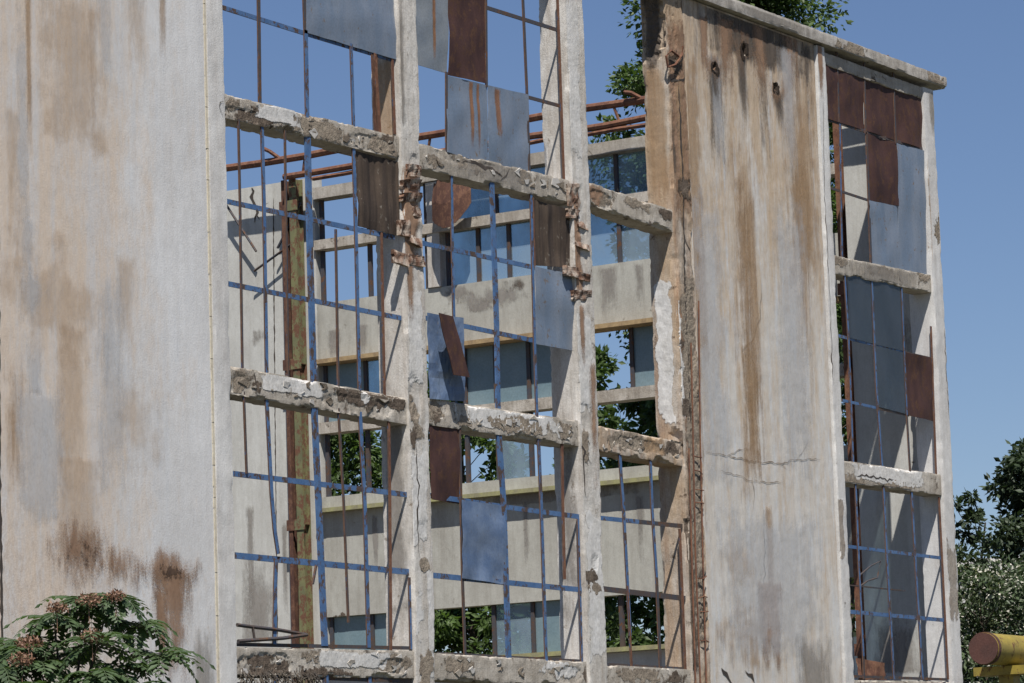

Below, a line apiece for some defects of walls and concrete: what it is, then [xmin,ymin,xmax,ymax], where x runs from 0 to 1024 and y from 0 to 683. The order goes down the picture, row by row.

spalling [225,97,398,157]
corrosion [401,168,419,307]
spalling [426,154,567,194]
corrosion [574,185,603,290]
spalling [625,196,672,221]
spalling [678,177,691,205]
corrosion [793,114,815,315]
corrosion [738,185,758,459]
flaking render [230,290,590,683]
spalling [603,275,709,683]
crack [708,442,820,506]
corrosion [47,520,198,671]